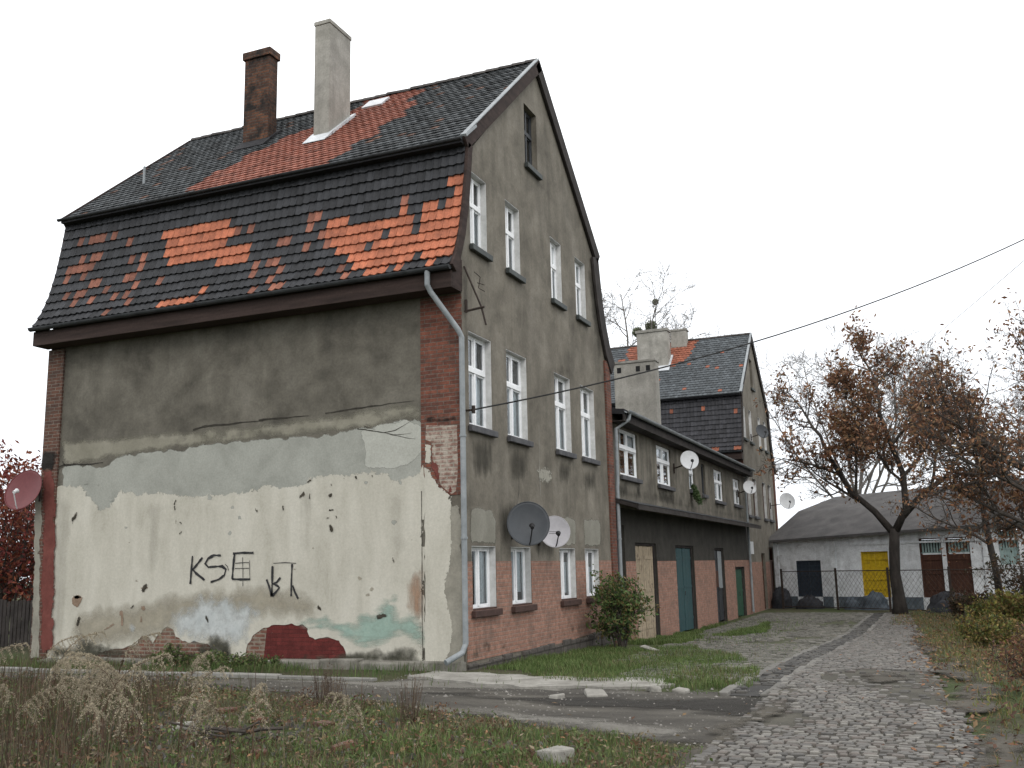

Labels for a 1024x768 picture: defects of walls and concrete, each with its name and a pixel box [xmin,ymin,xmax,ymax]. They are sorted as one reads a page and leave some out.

peeling [30,406,496,662]
crack [193,401,413,439]